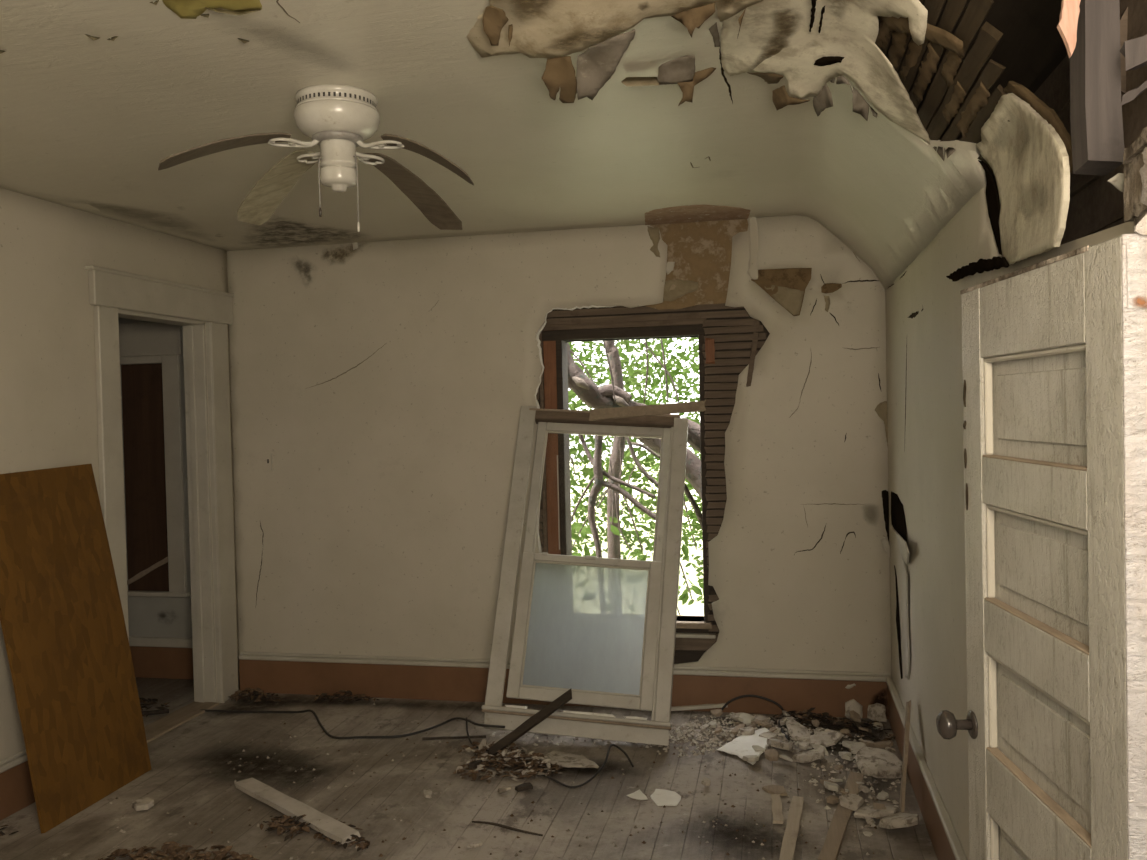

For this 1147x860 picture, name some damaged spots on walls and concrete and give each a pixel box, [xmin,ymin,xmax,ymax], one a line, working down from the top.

peeling [150,0,262,19]
flaking render [621,0,965,161]
flaking render [751,268,842,316]
crack [810,252,908,452]
flaking render [535,205,767,569]
crack [789,353,812,418]
crack [794,503,864,555]
flaking render [881,490,910,680]
flaking render [708,595,719,646]